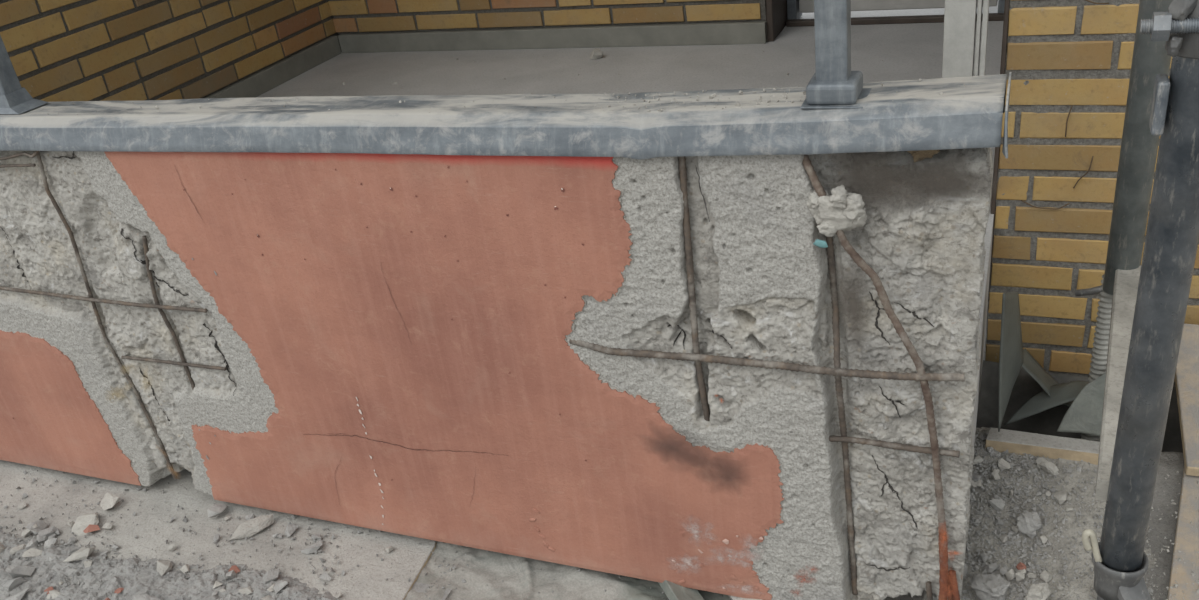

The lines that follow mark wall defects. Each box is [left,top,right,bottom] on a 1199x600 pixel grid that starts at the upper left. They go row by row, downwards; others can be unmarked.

spalling [0,151,279,496]
crack [303,434,508,504]
spalling [565,147,994,600]